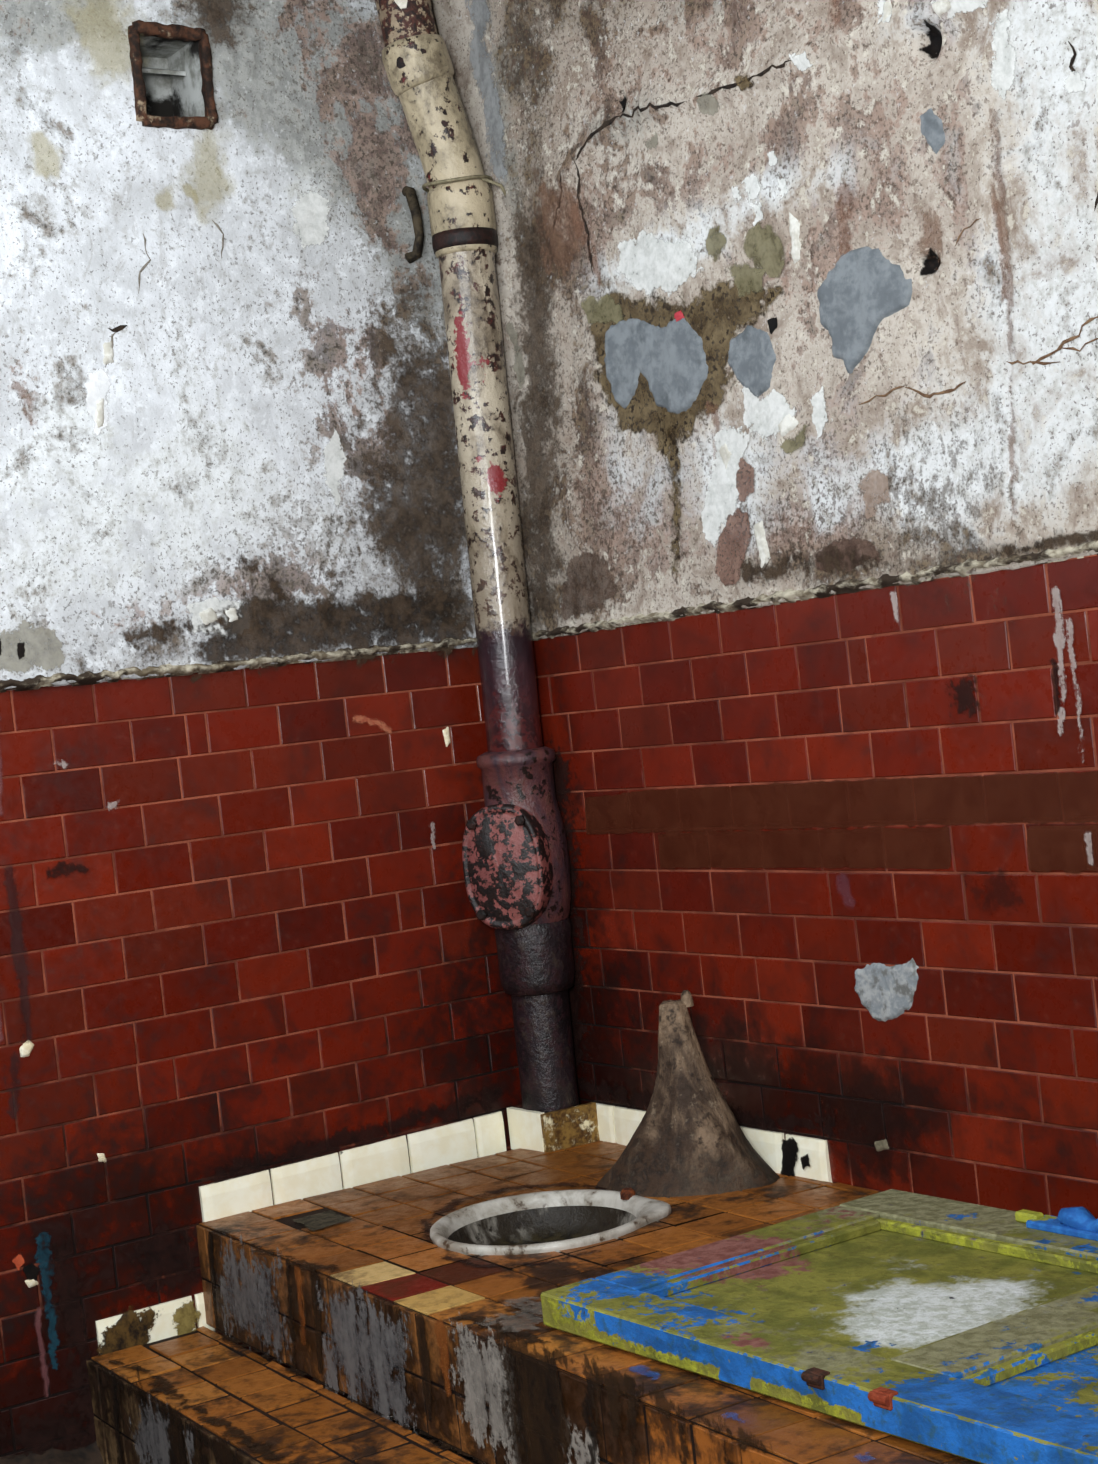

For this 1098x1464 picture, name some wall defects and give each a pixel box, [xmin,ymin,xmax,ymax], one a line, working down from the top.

crack [549,60,791,275]
water stain [123,333,477,683]
water stain [506,207,563,624]
water stain [589,230,828,575]
water stain [1050,619,1083,751]
water stain [208,1230,292,1365]
water stain [311,1267,432,1430]
water stain [441,1250,597,1268]